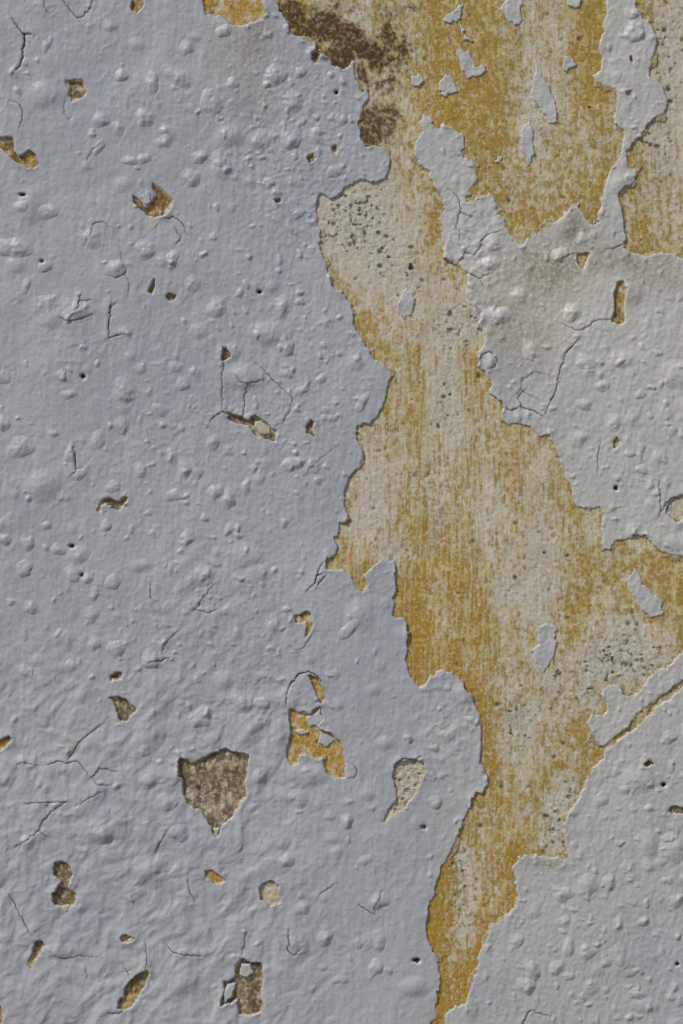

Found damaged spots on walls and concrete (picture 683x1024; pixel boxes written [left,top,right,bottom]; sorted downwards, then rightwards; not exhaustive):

crack [14,21,28,68]
spalling [0,137,39,167]
crack [212,366,291,422]
crack [508,319,608,414]
peeling [229,414,275,441]
peeling [279,0,683,1024]
peeling [111,697,136,721]
crack [15,725,107,848]
spalling [179,748,249,837]
peeling [53,862,75,912]
peeling [120,972,148,1008]
peeling [221,958,263,1014]